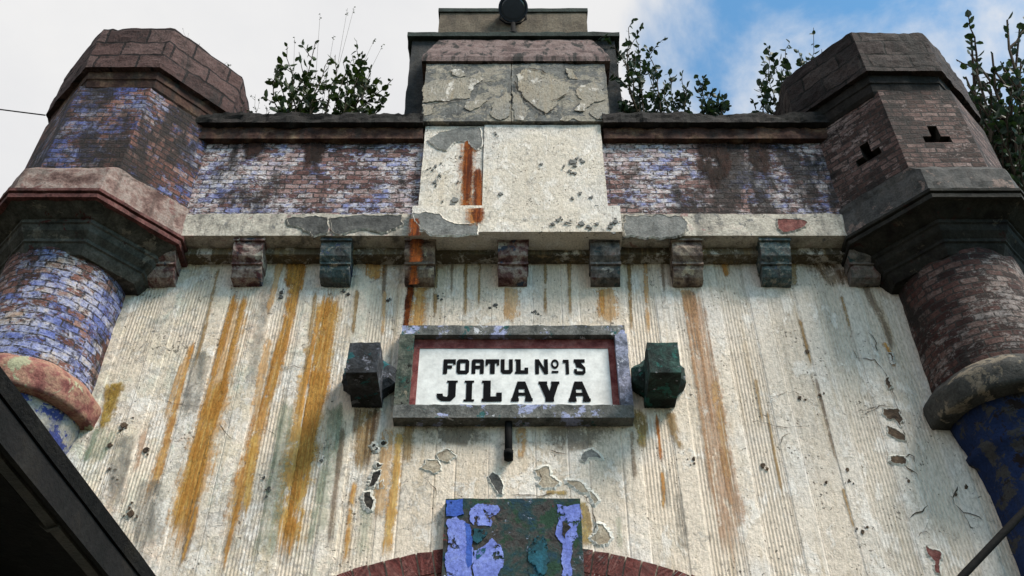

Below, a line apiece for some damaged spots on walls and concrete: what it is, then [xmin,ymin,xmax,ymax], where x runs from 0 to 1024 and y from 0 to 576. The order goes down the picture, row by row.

spalling [286,197,480,238]
corrosion [403,218,427,326]
corrosion [459,141,485,225]
peeling [422,68,609,187]
water stain [148,269,219,492]
water stain [166,294,248,561]
water stain [224,263,304,564]
water stain [269,290,359,555]
crack [854,332,917,474]
spalling [881,408,909,467]
peeling [445,472,505,576]
peeling [528,464,614,576]